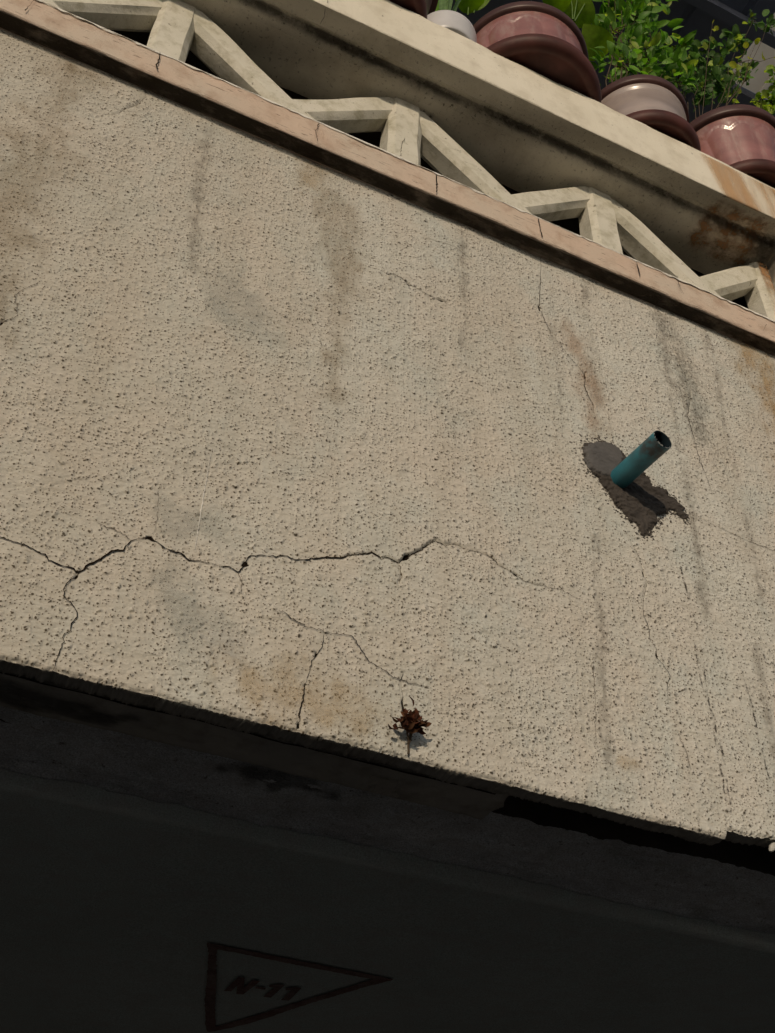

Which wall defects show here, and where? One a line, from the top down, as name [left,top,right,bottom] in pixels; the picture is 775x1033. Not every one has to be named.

rust [690,157,775,287]
crack [0,493,591,795]